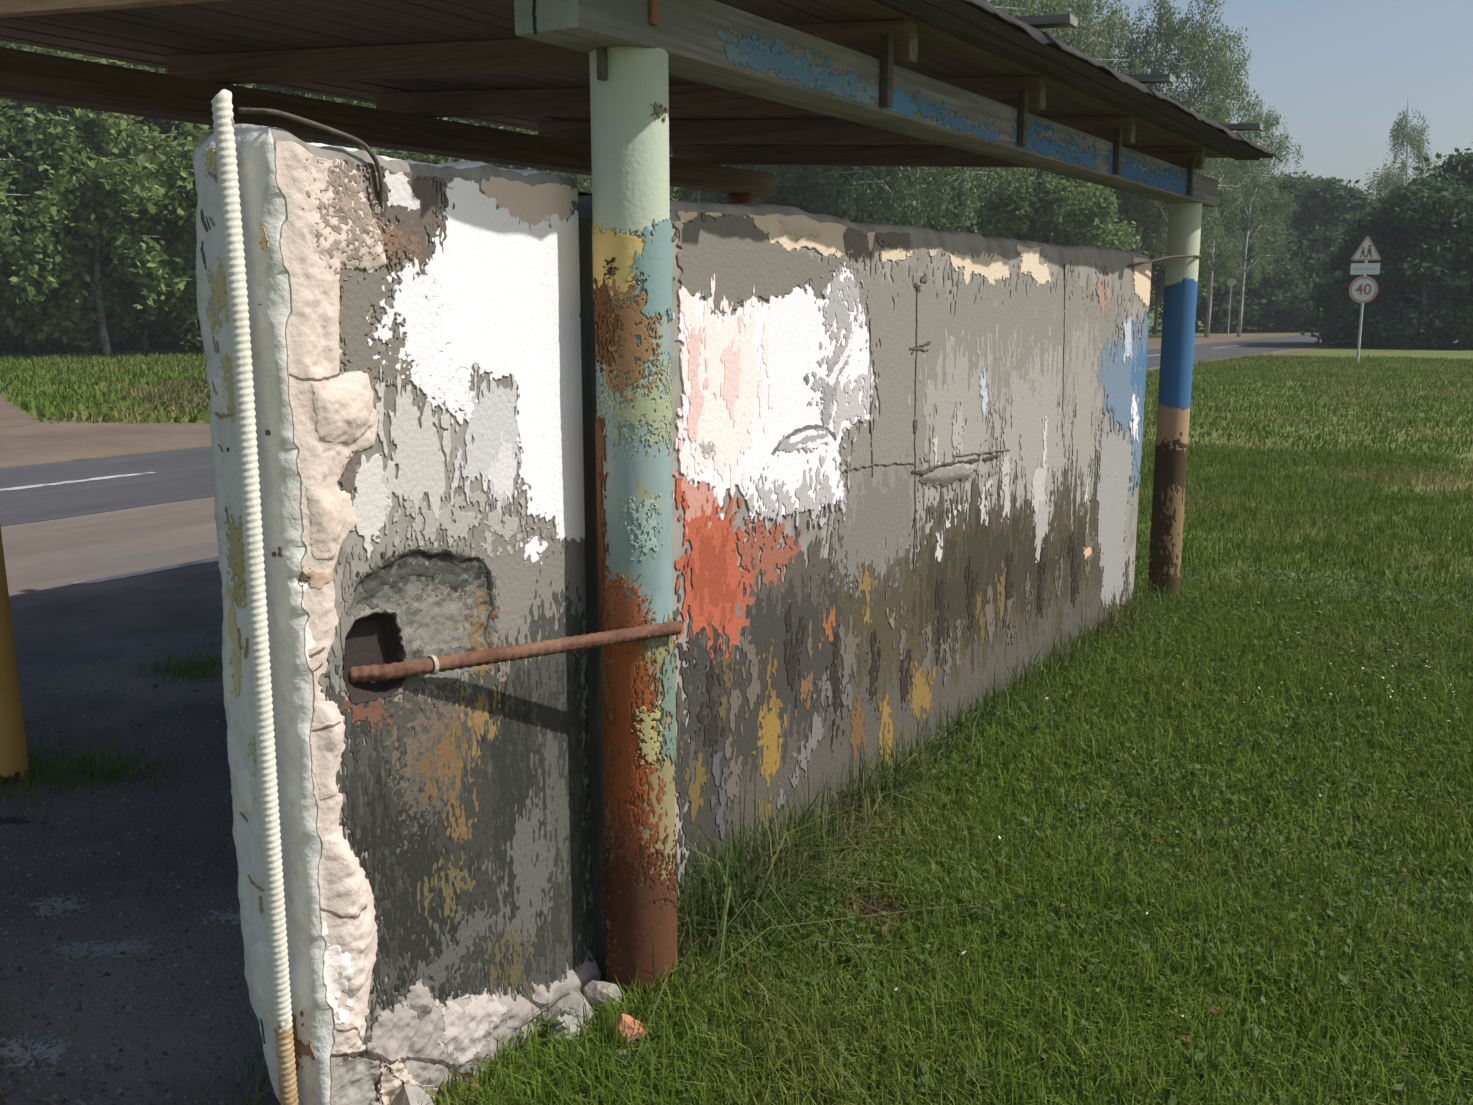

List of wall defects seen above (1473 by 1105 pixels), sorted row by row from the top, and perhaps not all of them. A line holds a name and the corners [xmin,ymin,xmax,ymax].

peeling [714,27,1202,506]
peeling [343,47,878,704]
rust [1148,404,1190,601]
peeling [298,574,315,664]
rust [338,257,709,1005]
water stain [300,209,1140,1044]
rust [291,1011,304,1084]
peeling [321,922,354,1025]
spalling [294,1039,438,1105]
peeling [406,988,508,1067]